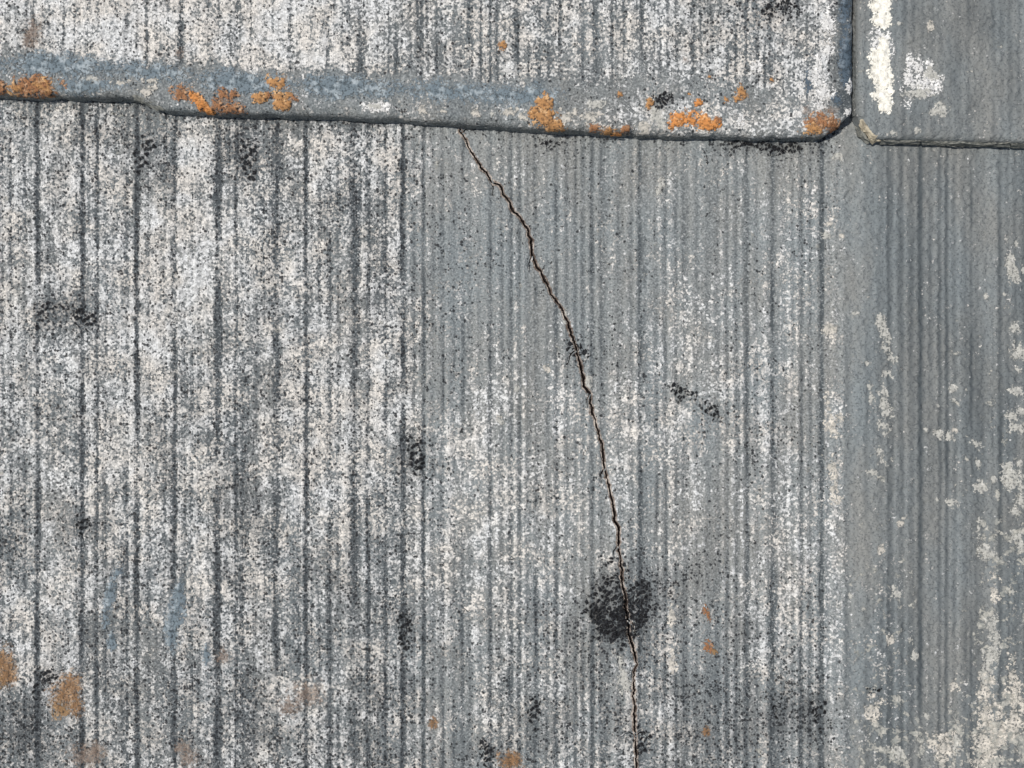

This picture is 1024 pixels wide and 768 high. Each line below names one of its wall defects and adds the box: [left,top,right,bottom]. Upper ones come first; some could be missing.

crack [458,128,651,768]